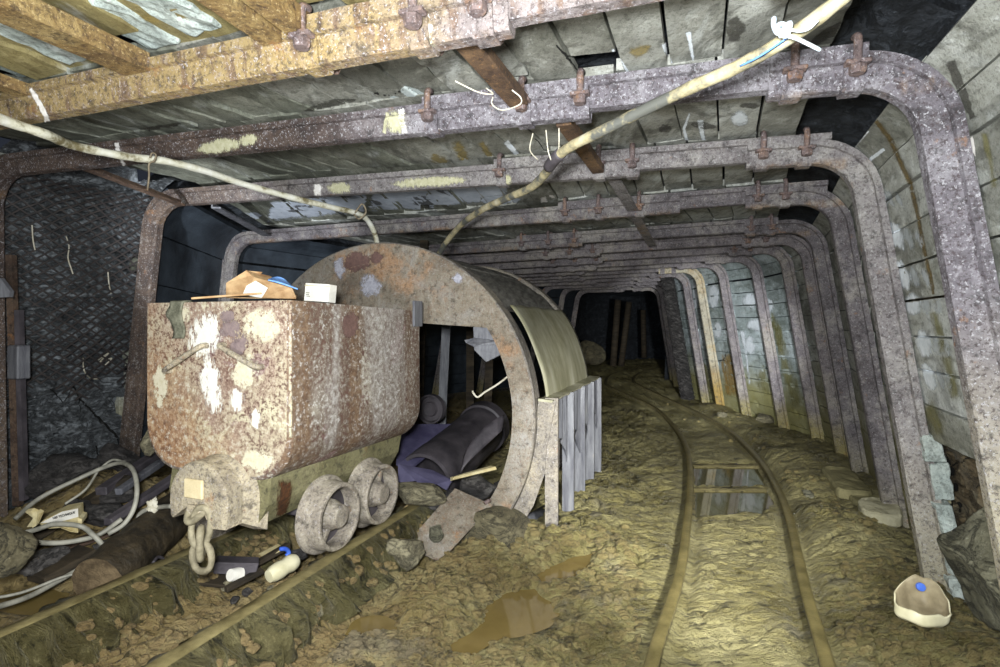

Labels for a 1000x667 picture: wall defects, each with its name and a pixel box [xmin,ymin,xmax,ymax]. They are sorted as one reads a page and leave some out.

leakage [890,223,957,396]